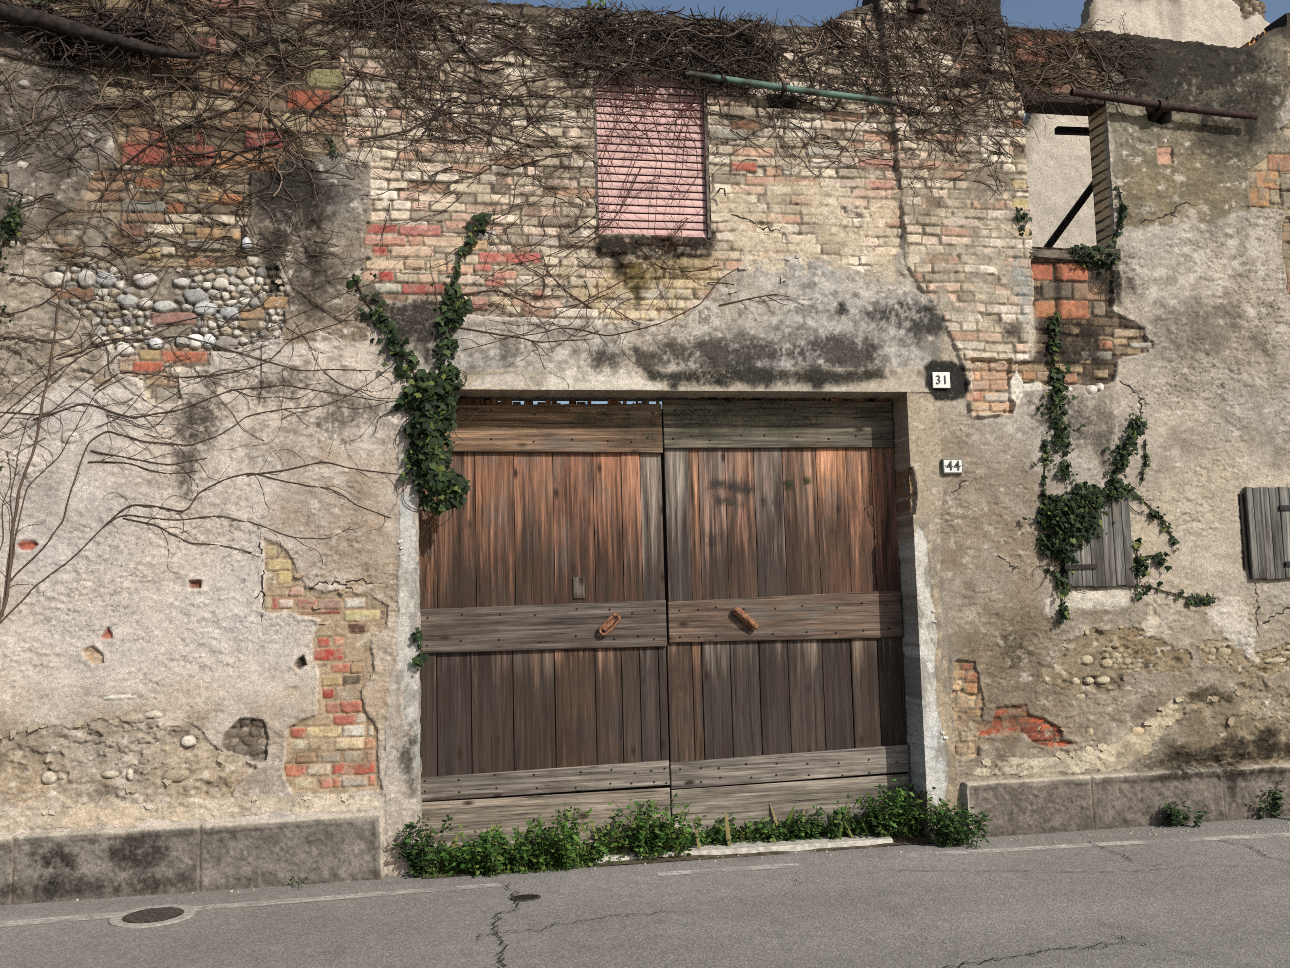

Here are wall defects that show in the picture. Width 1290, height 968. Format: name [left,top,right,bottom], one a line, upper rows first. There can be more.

crack [1141,202,1200,223]
flaking render [1247,122,1290,295]
flaking render [48,262,286,404]
water stain [592,332,883,389]
water stain [837,302,945,337]
flaking render [0,492,420,832]
flaking render [909,467,1290,806]
crack [1255,583,1290,644]